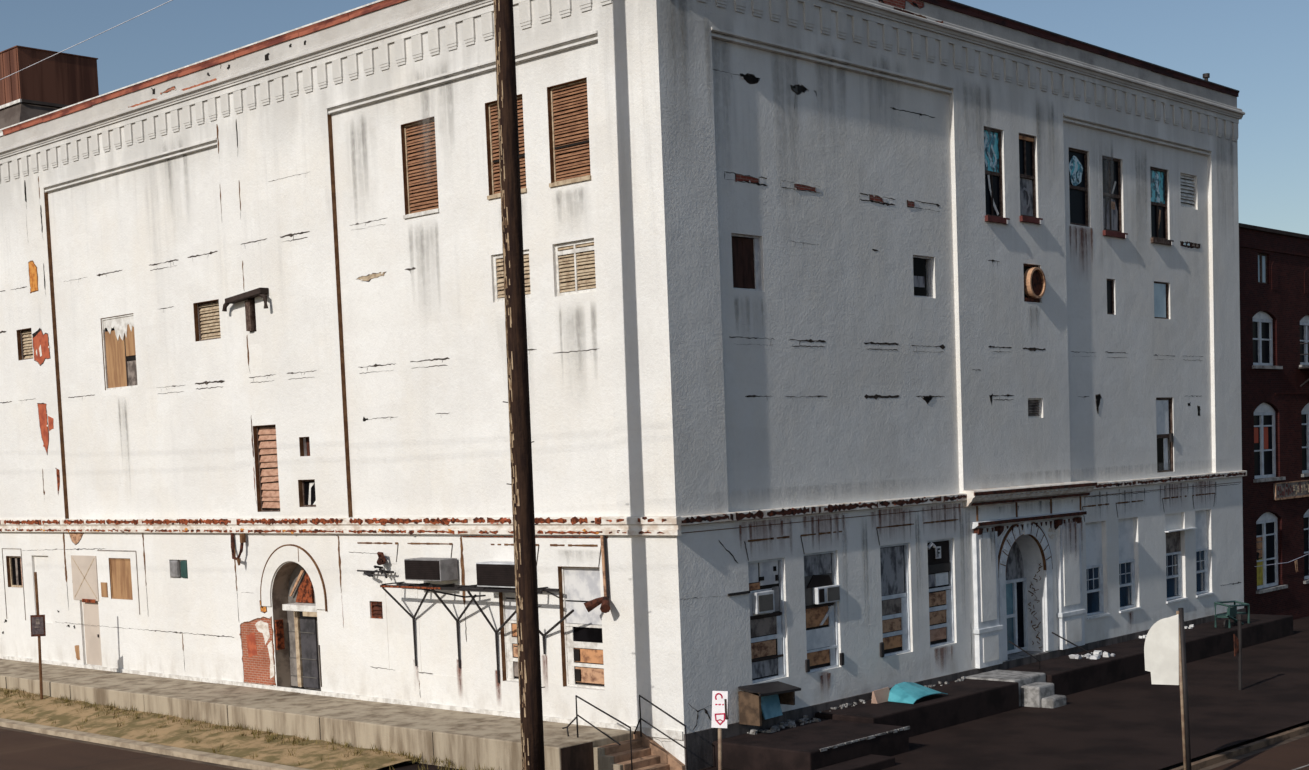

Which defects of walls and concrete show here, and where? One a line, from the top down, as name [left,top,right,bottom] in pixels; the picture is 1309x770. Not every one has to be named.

peeling [878,0,924,15]
spalling [724,171,820,193]
spalling [859,193,940,211]
peeling [239,601,276,686]